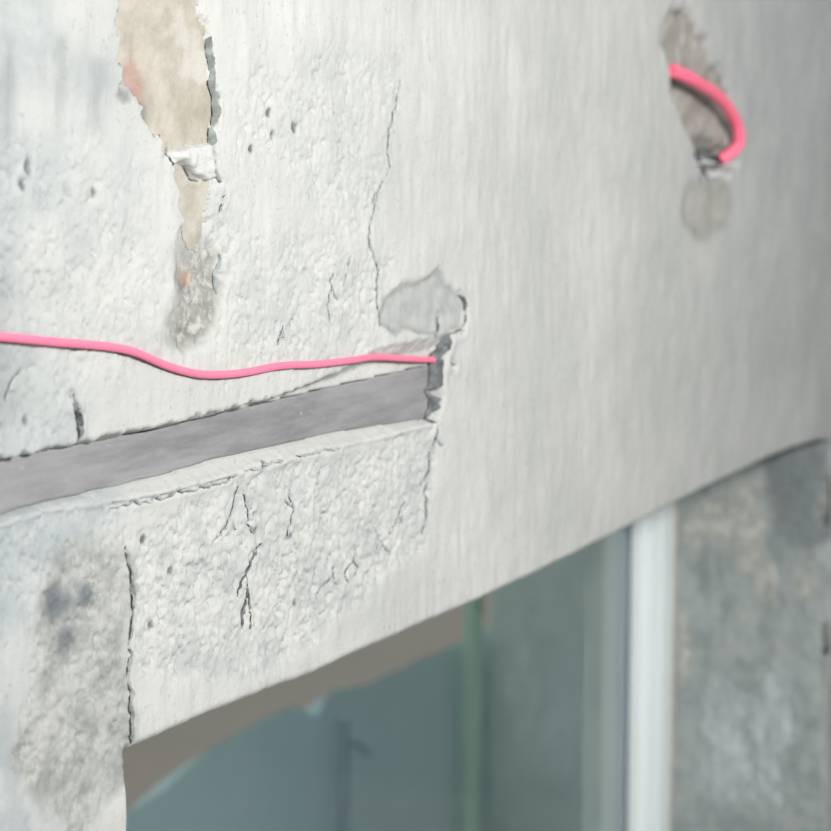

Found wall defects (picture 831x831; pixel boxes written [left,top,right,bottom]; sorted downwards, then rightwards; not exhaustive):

flaking render [114,0,222,348]
crack [327,256,352,321]
crack [368,79,401,326]
flaking render [380,271,461,338]
flaking render [658,9,728,95]
flaking render [670,77,730,184]
crack [110,447,341,629]
crack [124,546,136,743]